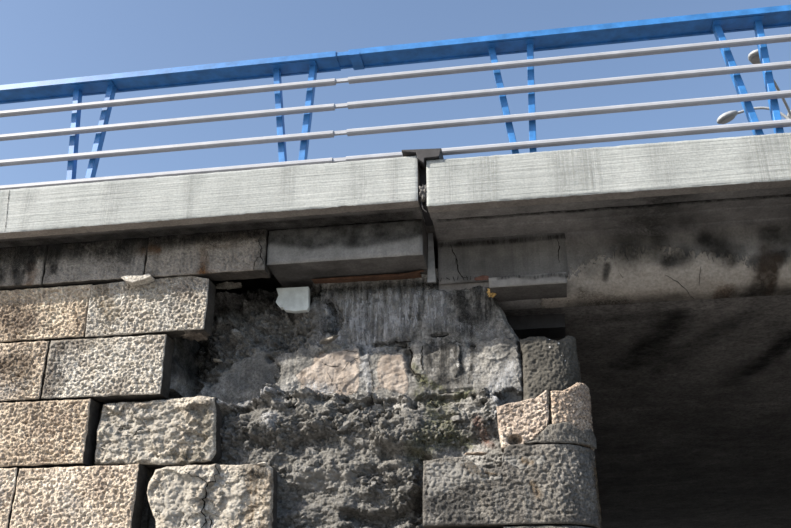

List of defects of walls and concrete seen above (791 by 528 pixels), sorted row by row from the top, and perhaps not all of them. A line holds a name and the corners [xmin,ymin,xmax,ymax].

leakage [0,212,423,286]
crack [437,246,471,282]
leakage [661,252,689,267]
leakage [698,233,737,264]
leakage [725,226,791,298]
leakage [310,281,497,395]
spalling [220,299,499,528]
leakage [486,361,515,413]
crack [497,390,551,436]
spalling [154,471,203,527]
crack [180,465,220,528]
spalling [214,477,246,524]